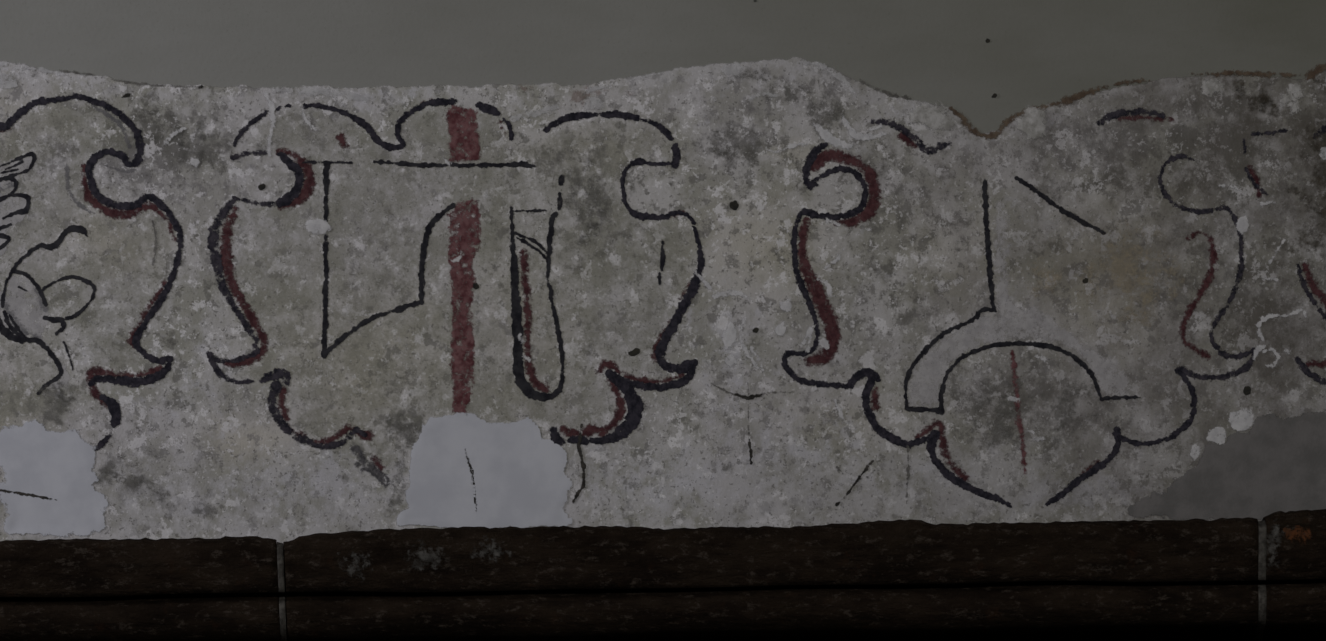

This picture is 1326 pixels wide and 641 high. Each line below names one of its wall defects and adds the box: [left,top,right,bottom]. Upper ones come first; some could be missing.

flaking render [0,57,1326,550]